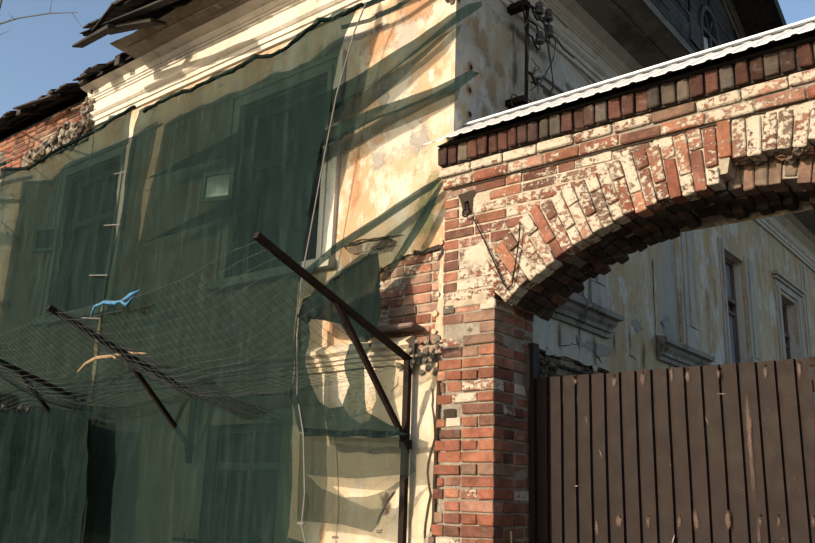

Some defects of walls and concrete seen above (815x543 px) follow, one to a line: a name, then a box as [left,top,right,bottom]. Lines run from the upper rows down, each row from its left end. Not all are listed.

leakage [363,6,394,57]
peeling [375,60,419,106]
flaking render [0,104,89,177]
leakage [351,147,359,207]
peeling [371,118,429,170]
spalling [753,144,814,167]
spalling [458,190,476,215]
peeling [458,238,495,270]
spalling [539,347,616,385]